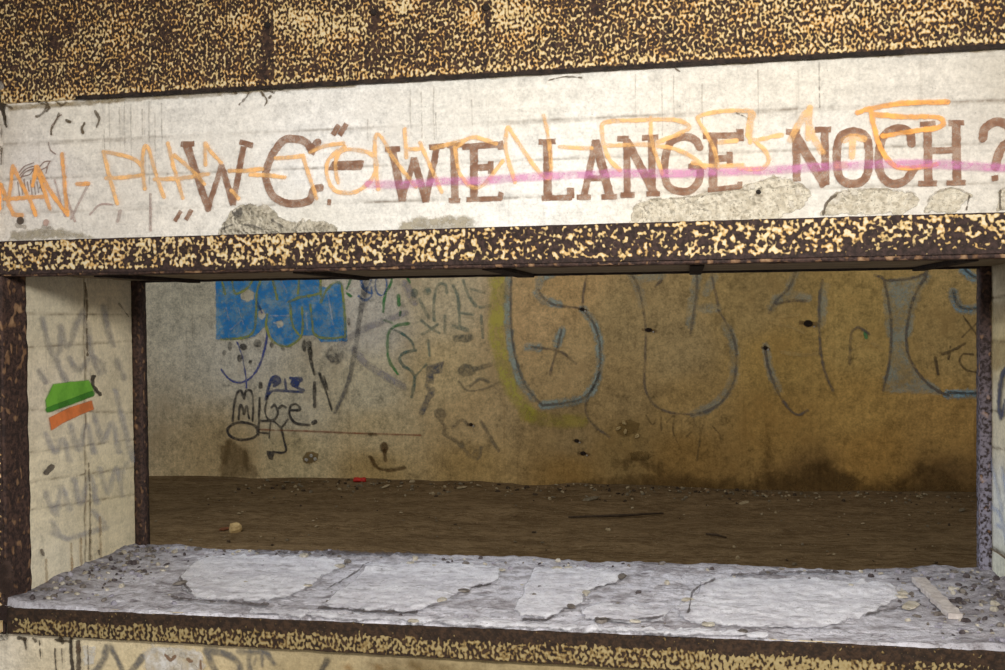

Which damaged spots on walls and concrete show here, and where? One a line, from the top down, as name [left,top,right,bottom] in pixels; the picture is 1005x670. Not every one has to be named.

spalling [629,175,811,223]
spalling [820,187,973,215]
spalling [996,190,1005,211]
spalling [400,216,471,230]
crack [255,549,428,589]
crack [171,576,269,606]
crack [595,570,834,621]
crack [866,599,920,615]